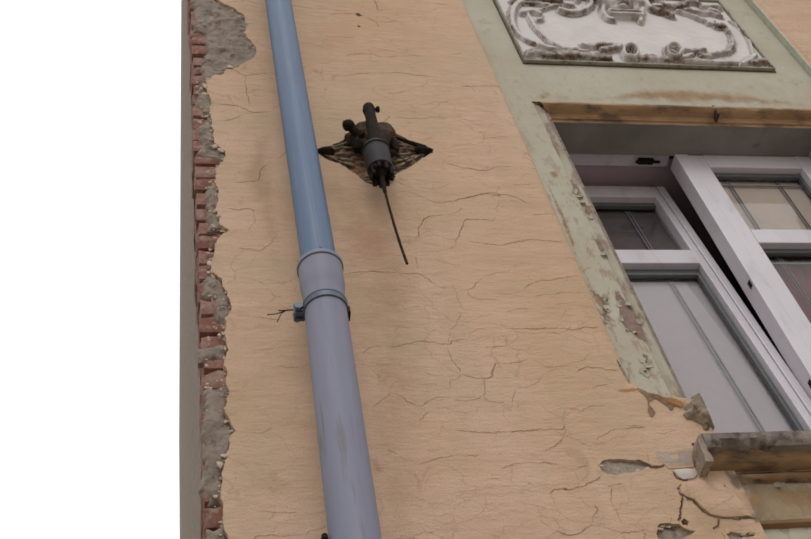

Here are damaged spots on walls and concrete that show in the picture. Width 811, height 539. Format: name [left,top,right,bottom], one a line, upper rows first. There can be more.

spalling [191,0,256,165]
spalling [204,184,224,234]
crack [460,192,527,203]
spalling [197,277,230,368]
peeling [593,289,646,341]
crack [392,339,524,403]
spalling [638,388,715,431]
spalling [198,383,233,508]
crack [551,477,622,494]
spalling [599,461,648,475]
spalling [205,521,226,539]
spalling [657,523,694,539]